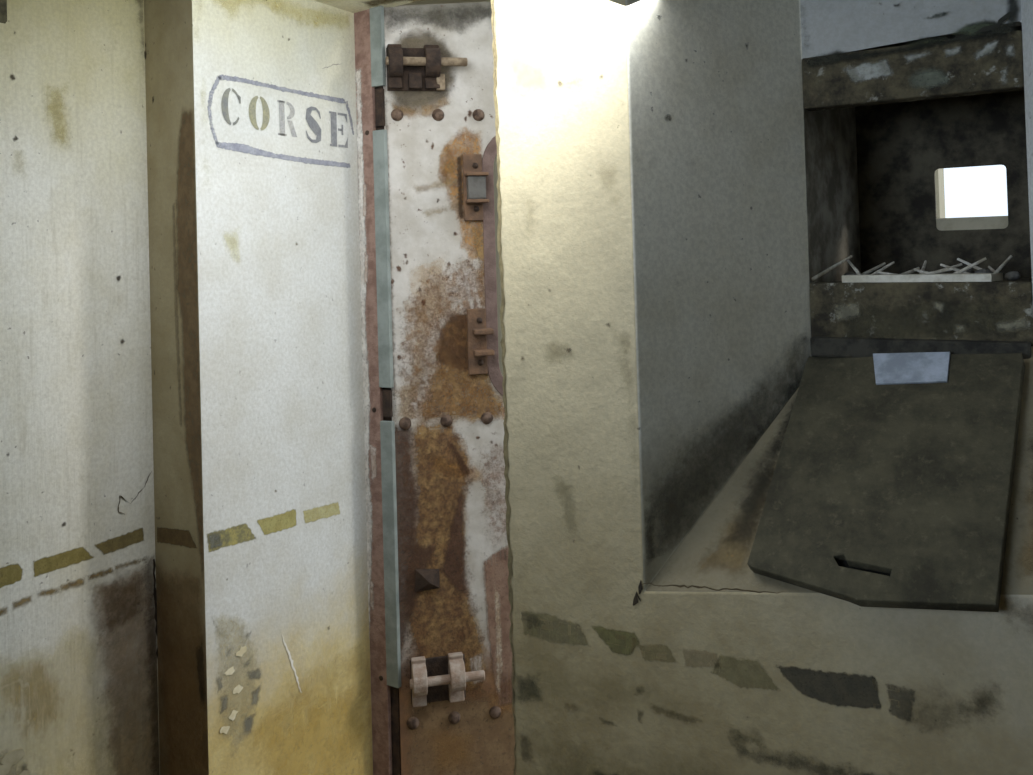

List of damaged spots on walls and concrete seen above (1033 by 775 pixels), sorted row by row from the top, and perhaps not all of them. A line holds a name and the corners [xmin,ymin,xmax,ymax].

rust [392,111,516,775]
water stain [646,363,800,568]